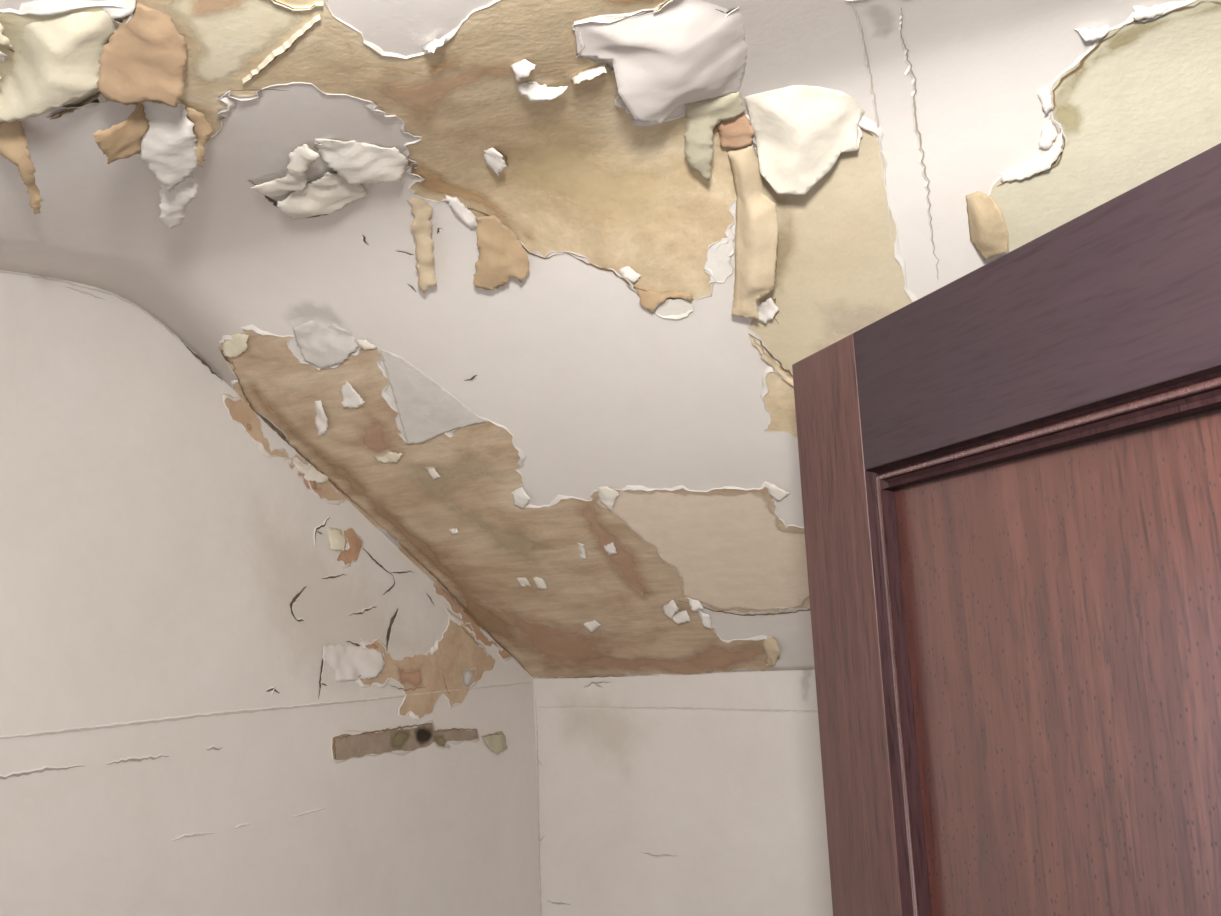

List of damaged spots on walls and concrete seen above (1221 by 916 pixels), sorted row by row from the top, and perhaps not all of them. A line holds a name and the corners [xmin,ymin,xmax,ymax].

peeling [0,0,918,438]
crack [845,0,898,266]
crack [898,8,939,280]
peeling [966,0,1221,260]
crack [313,516,330,545]
peeling [218,321,810,763]
crack [0,548,818,916]